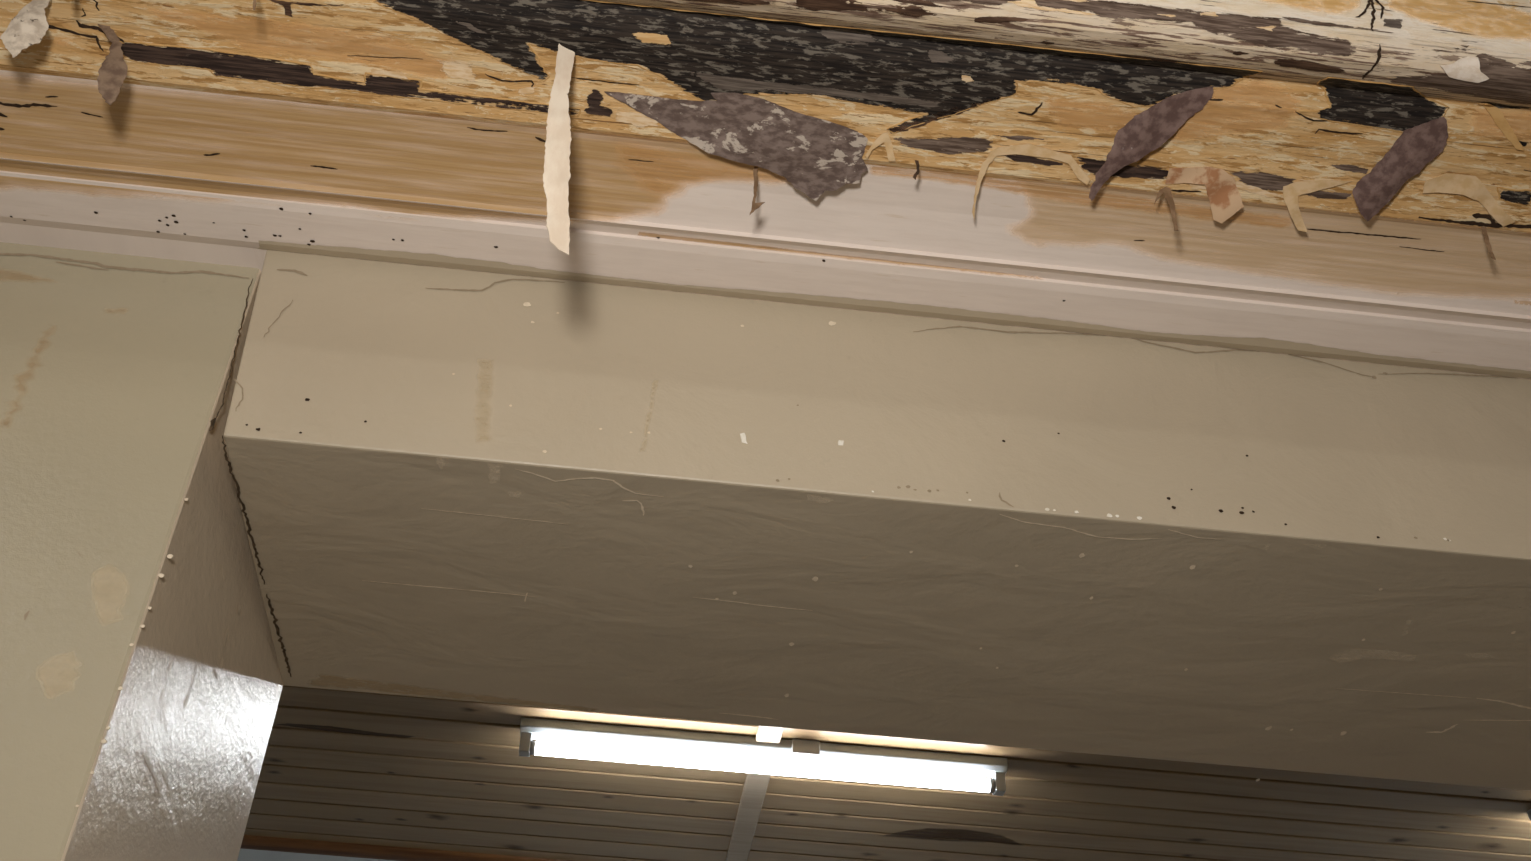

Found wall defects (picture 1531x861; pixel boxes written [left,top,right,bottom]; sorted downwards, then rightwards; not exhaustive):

peeling [0,0,51,58]
crack [1356,0,1385,79]
peeling [97,0,1531,260]
crack [427,279,565,291]
crack [0,253,307,677]